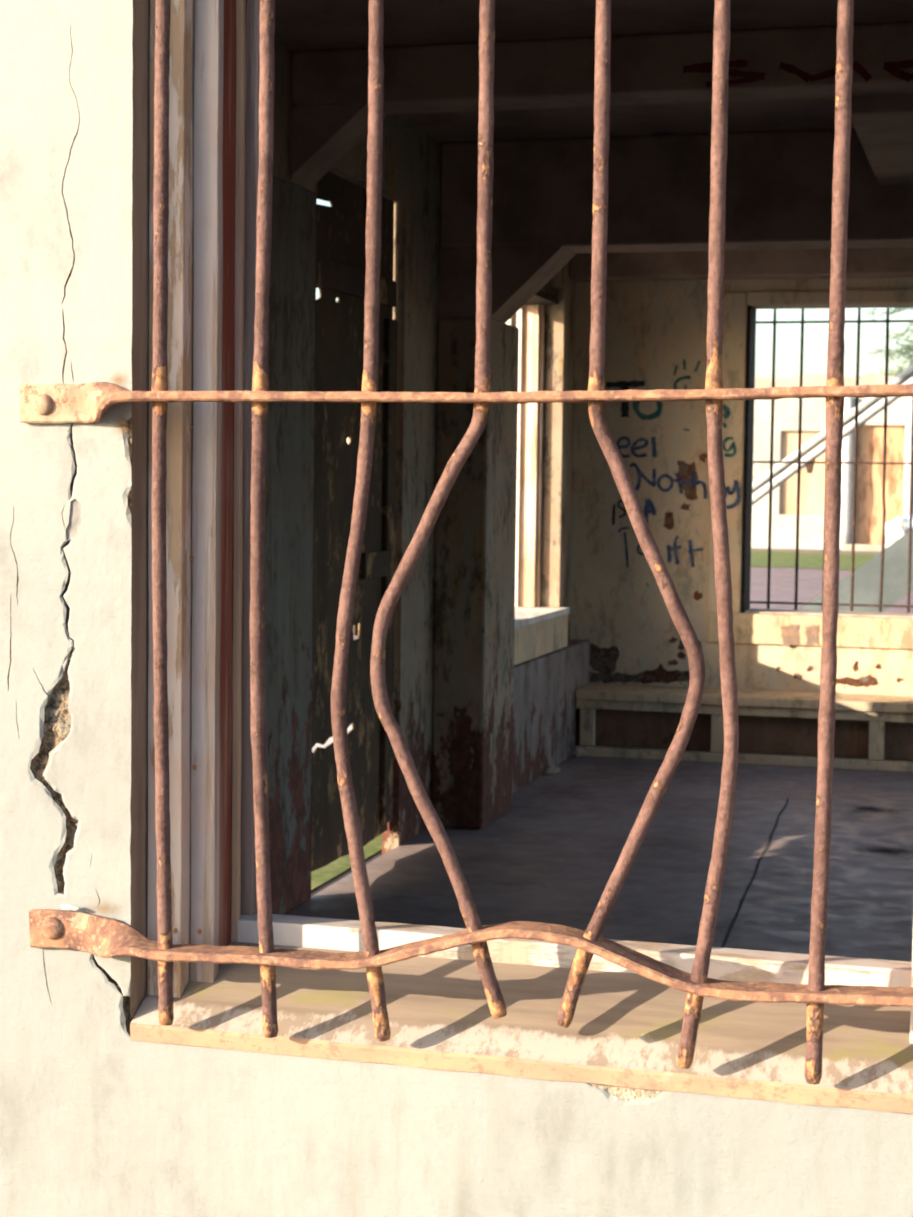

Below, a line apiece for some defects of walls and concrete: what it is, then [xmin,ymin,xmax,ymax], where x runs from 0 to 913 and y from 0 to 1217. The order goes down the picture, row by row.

crack [61,27,80,384]
crack [7,423,100,908]
peeling [589,637,690,684]
peeling [780,624,820,647]
peeling [836,661,881,687]
crack [721,798,789,948]
crack [92,954,134,1036]
peeling [589,1083,661,1101]